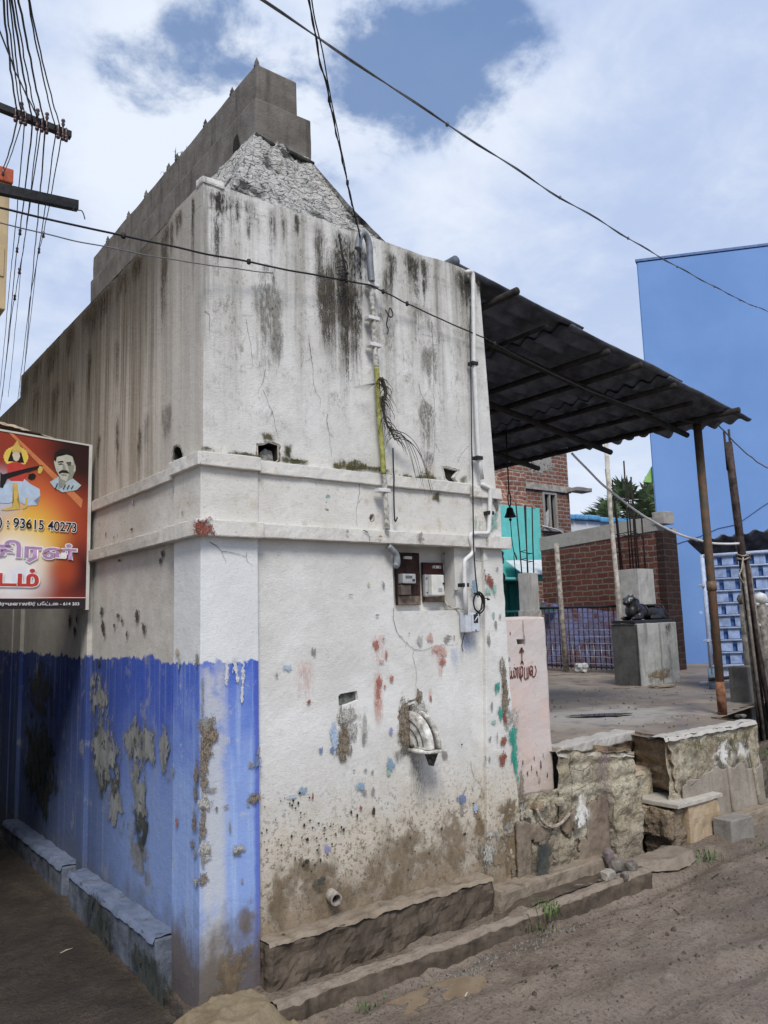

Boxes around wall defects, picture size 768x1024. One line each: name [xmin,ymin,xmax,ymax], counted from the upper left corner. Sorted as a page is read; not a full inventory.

leakage [20,256,142,418]
leakage [161,199,194,330]
leakage [315,229,367,382]
flaking render [190,517,215,537]
peeling [409,632,455,666]
leakage [23,658,58,821]
flaking render [190,679,229,887]
flaking render [278,638,394,872]
flaking render [387,688,432,775]
peeling [456,793,480,820]
leakage [269,866,293,927]
leakage [310,869,356,918]